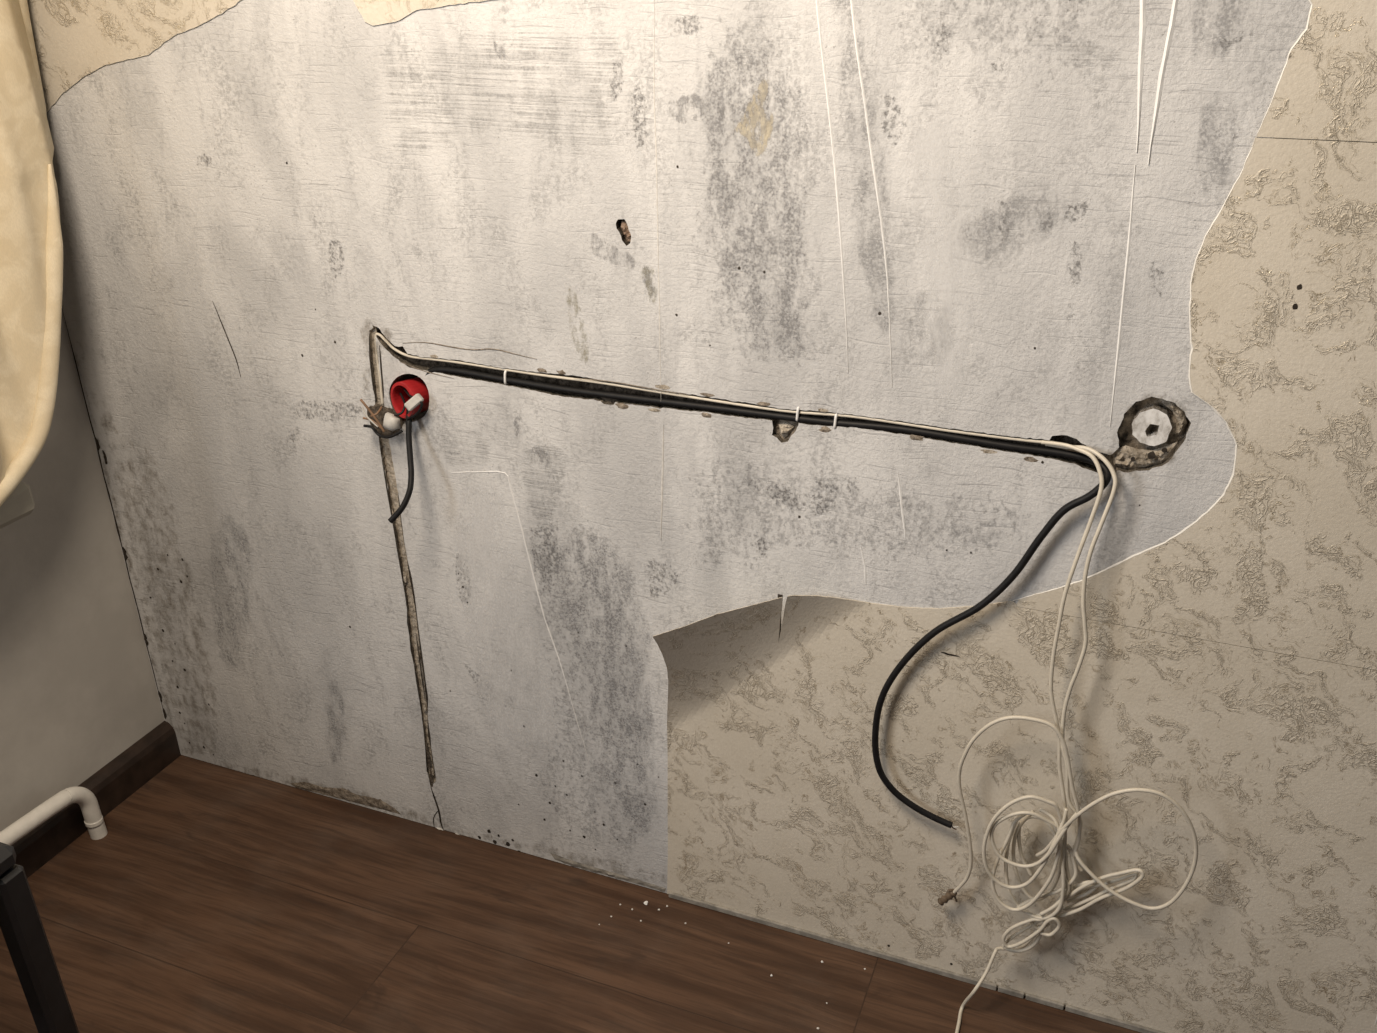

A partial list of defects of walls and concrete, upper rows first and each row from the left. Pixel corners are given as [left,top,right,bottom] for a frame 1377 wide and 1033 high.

peeling [46,0,1313,893]